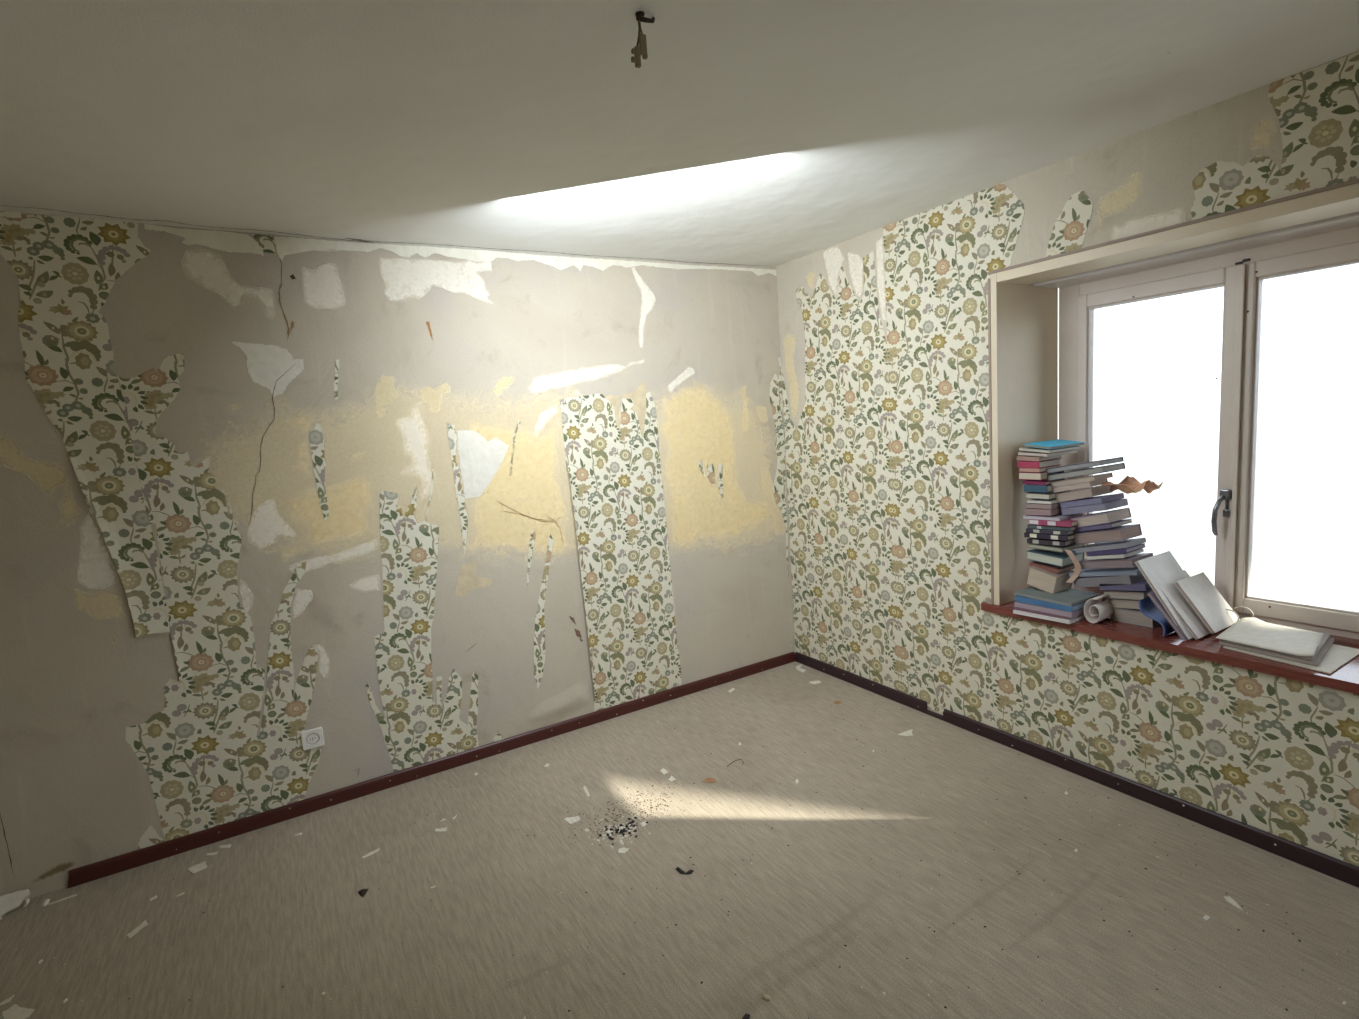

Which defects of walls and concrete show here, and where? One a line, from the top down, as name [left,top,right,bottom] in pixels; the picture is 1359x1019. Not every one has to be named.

peeling [457,430,509,499]